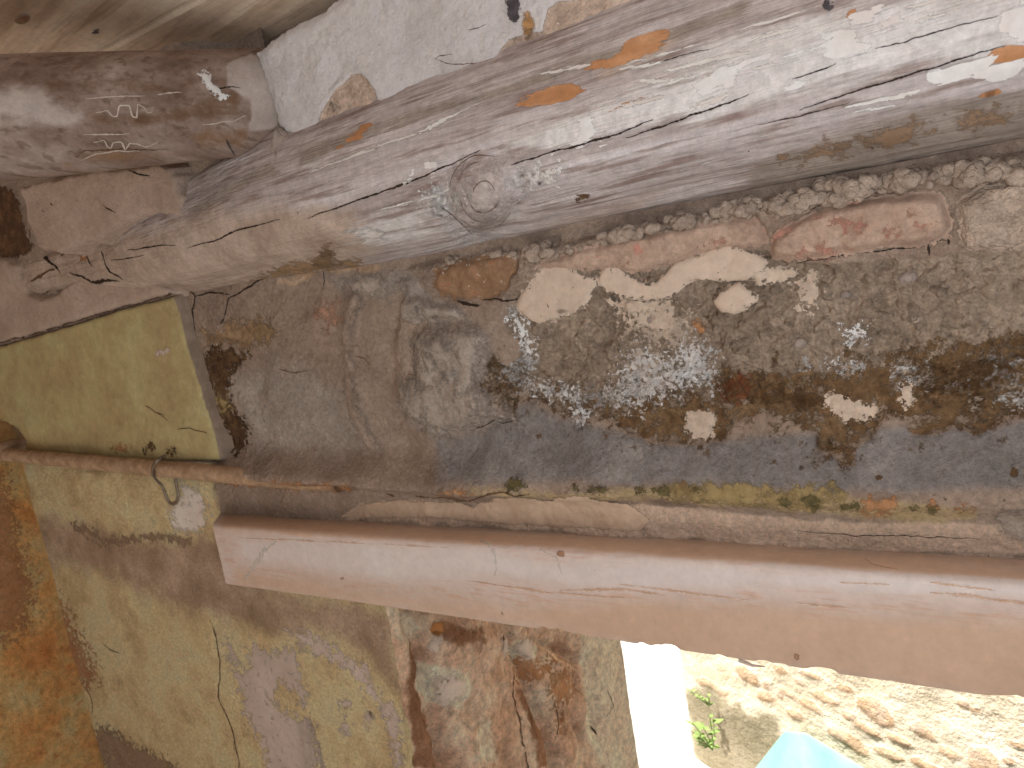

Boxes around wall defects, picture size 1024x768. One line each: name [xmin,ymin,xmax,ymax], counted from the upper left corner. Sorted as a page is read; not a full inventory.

peeling [605,297,667,316]
peeling [752,265,828,317]
leakage [480,292,1024,514]
crack [210,621,240,764]